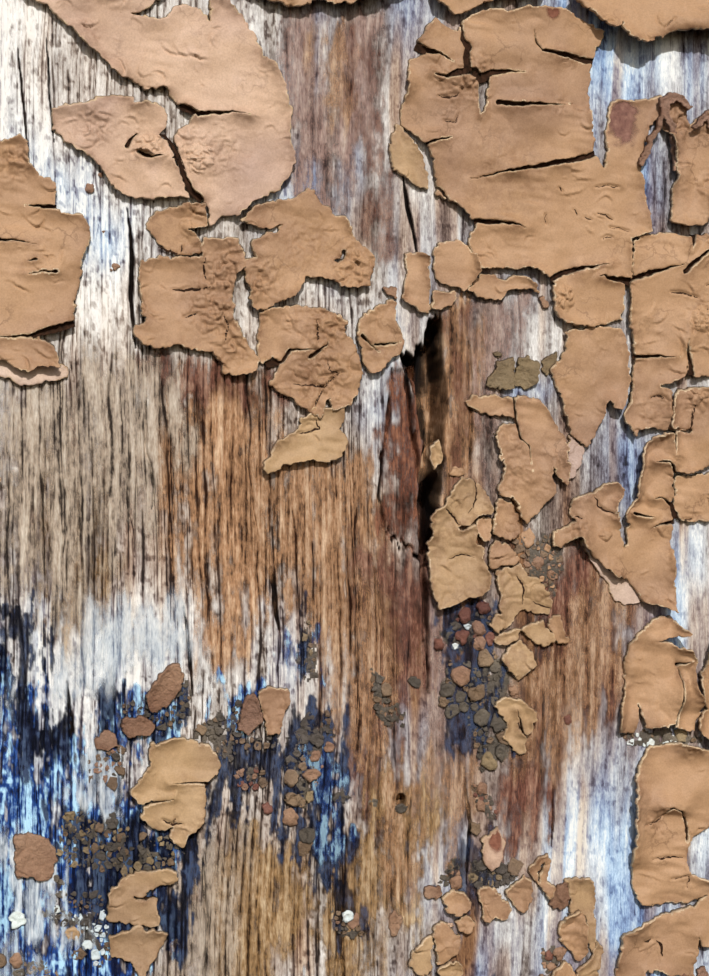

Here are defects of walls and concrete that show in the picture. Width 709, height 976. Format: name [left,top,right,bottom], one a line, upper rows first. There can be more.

crack [414,23,557,146]
crack [541,49,593,65]
peeling [0,133,91,386]
crack [550,234,709,310]
peeling [35,0,709,773]
peeling [12,663,336,976]
peeling [407,782,604,976]
crack [647,808,690,888]
peeling [8,911,27,929]
peeling [330,907,364,940]
peeling [388,909,403,937]
peeling [0,952,59,976]